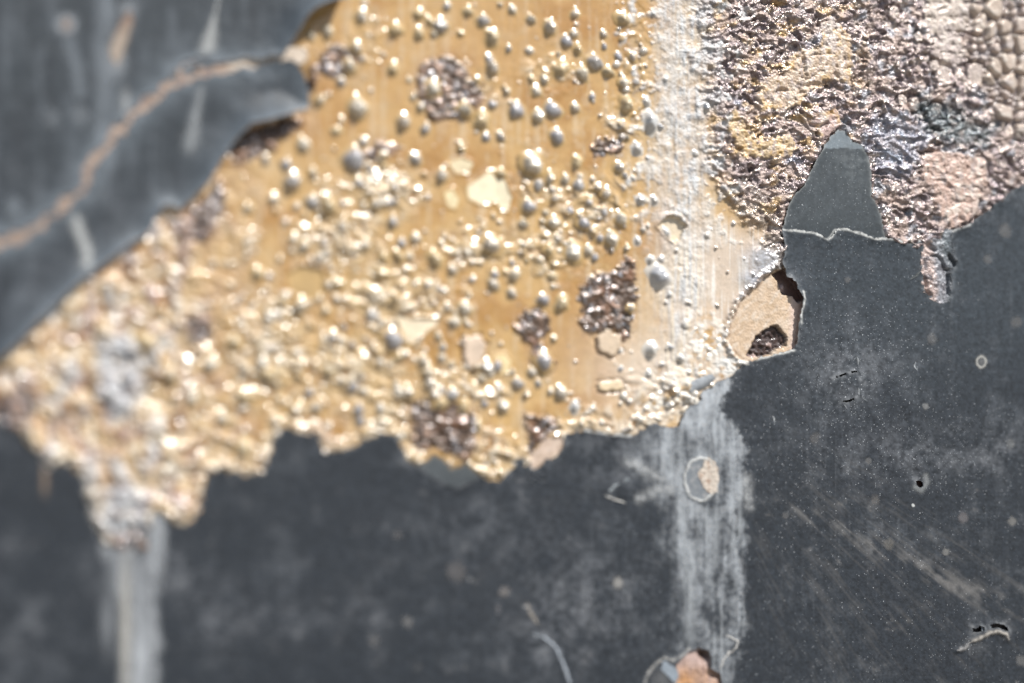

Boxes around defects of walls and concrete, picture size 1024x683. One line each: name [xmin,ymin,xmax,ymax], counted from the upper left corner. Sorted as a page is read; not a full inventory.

peeling [0,0,1024,545]
leakage [615,0,756,577]
leakage [93,478,162,683]
spalling [644,648,722,683]
leakage [724,542,744,620]